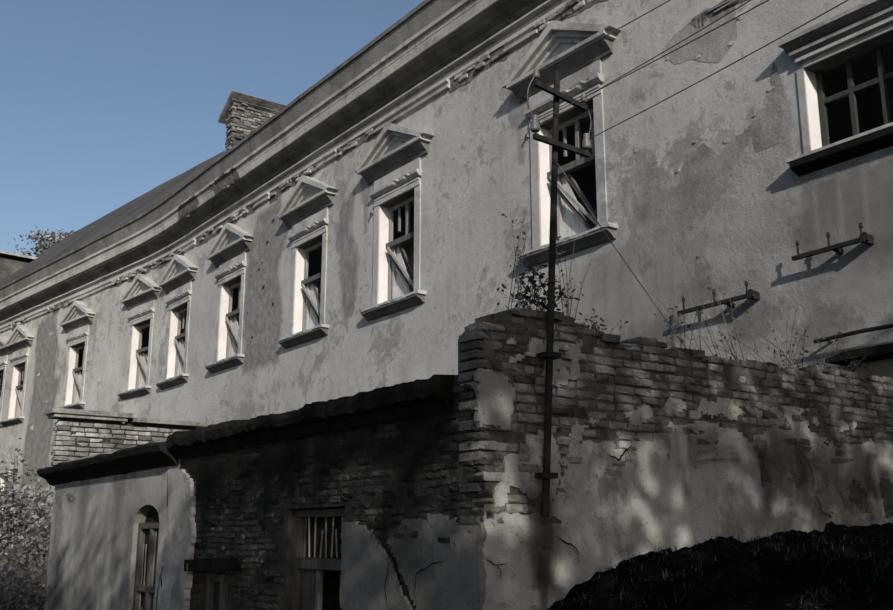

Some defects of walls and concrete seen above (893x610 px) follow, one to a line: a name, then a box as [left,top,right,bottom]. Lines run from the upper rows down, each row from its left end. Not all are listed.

spalling [661,0,762,64]
spalling [177,195,199,225]
spalling [192,62,893,610]
crack [607,446,632,463]